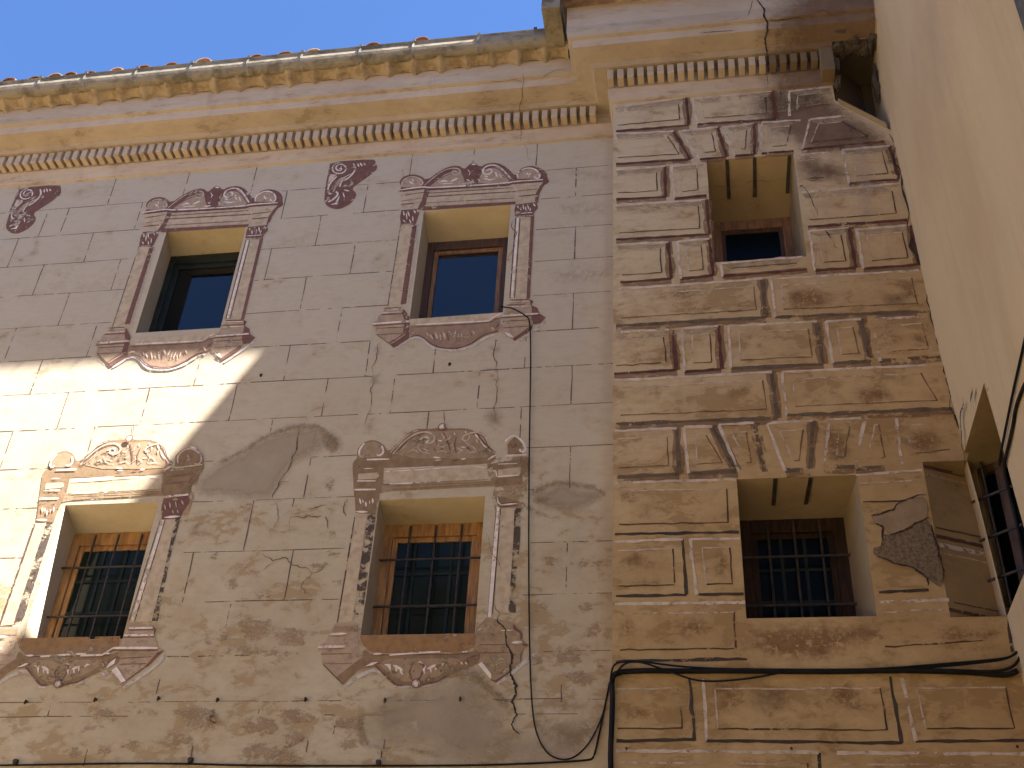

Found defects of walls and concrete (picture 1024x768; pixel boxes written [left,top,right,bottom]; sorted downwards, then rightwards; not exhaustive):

crack [703,0,832,81]
spalling [832,28,881,104]
crack [262,434,347,596]
flaking render [871,494,945,586]
crack [494,602,522,734]